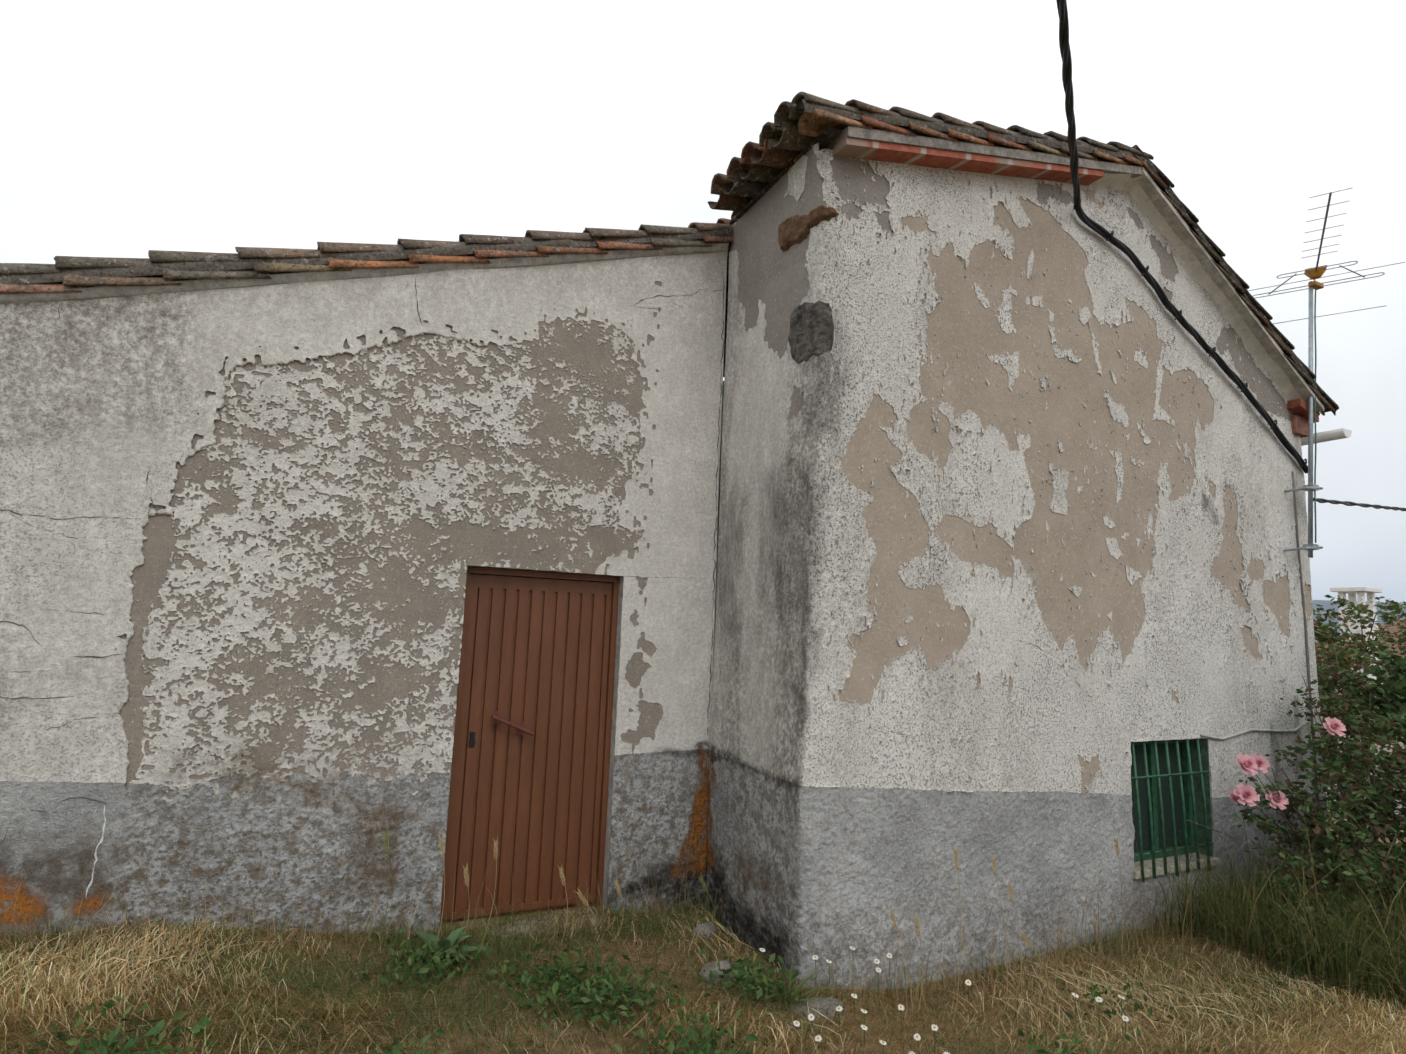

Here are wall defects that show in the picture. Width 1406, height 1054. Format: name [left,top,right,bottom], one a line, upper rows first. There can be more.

peeling [729,147,1312,732]
peeling [115,307,664,792]
crack [0,609,122,730]
rust [672,750,715,877]
water stain [665,742,798,789]